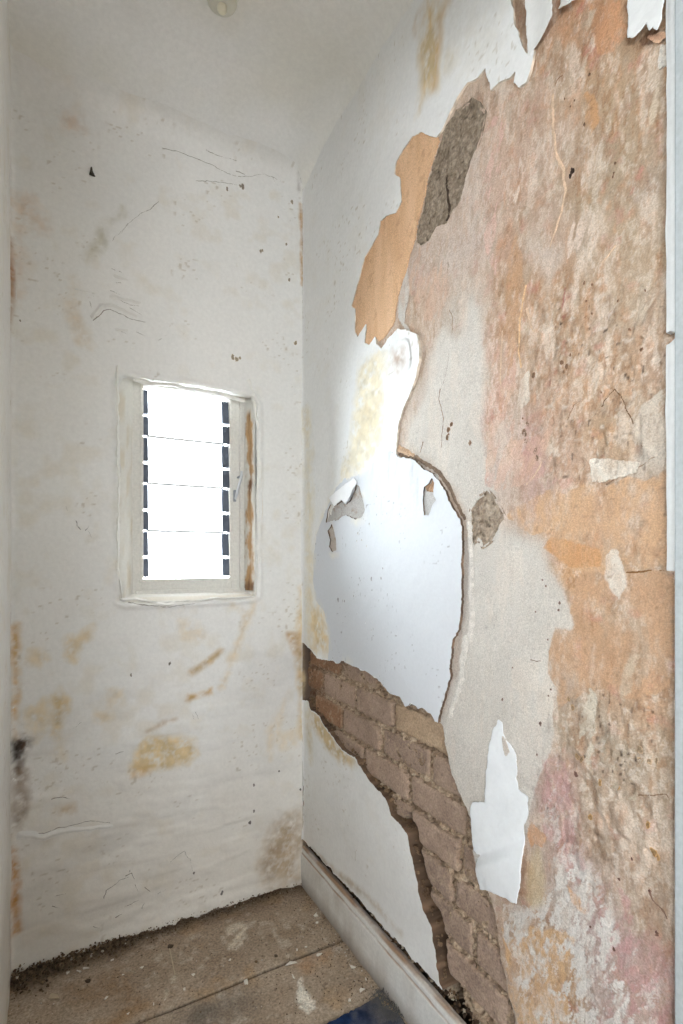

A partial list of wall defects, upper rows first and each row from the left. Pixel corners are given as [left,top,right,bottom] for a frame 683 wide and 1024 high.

crack [163,148,276,185]
rust [244,405,255,591]
peeling [308,0,675,1024]
leakage [10,618,130,837]
leakage [123,595,263,783]
crack [16,821,113,841]
leakage [251,798,406,944]
leakage [44,958,179,1024]